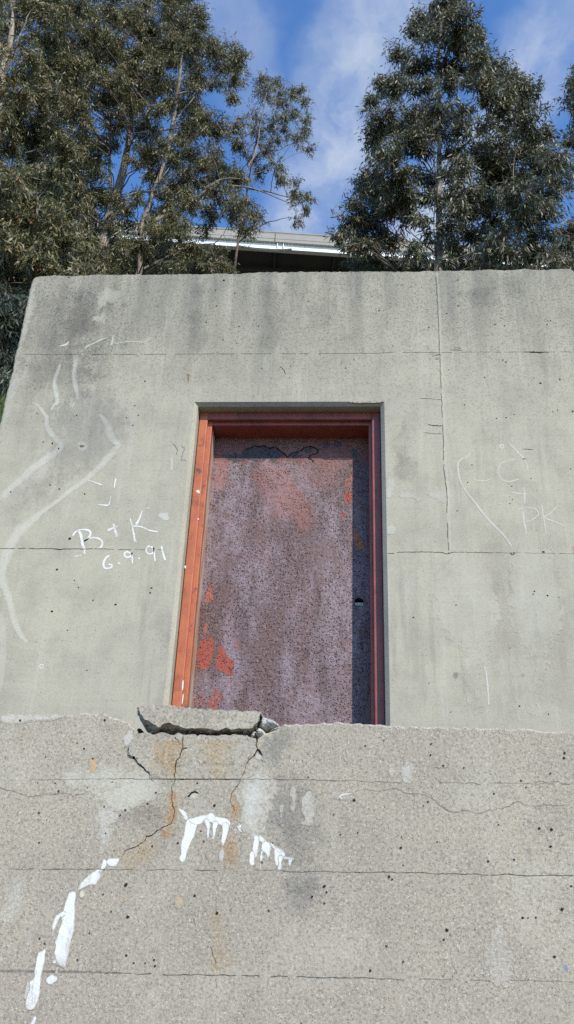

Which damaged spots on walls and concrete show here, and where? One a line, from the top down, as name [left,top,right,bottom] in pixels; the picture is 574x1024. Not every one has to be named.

rust [211,446,356,541]
crack [124,737,185,853]
crack [230,737,265,810]